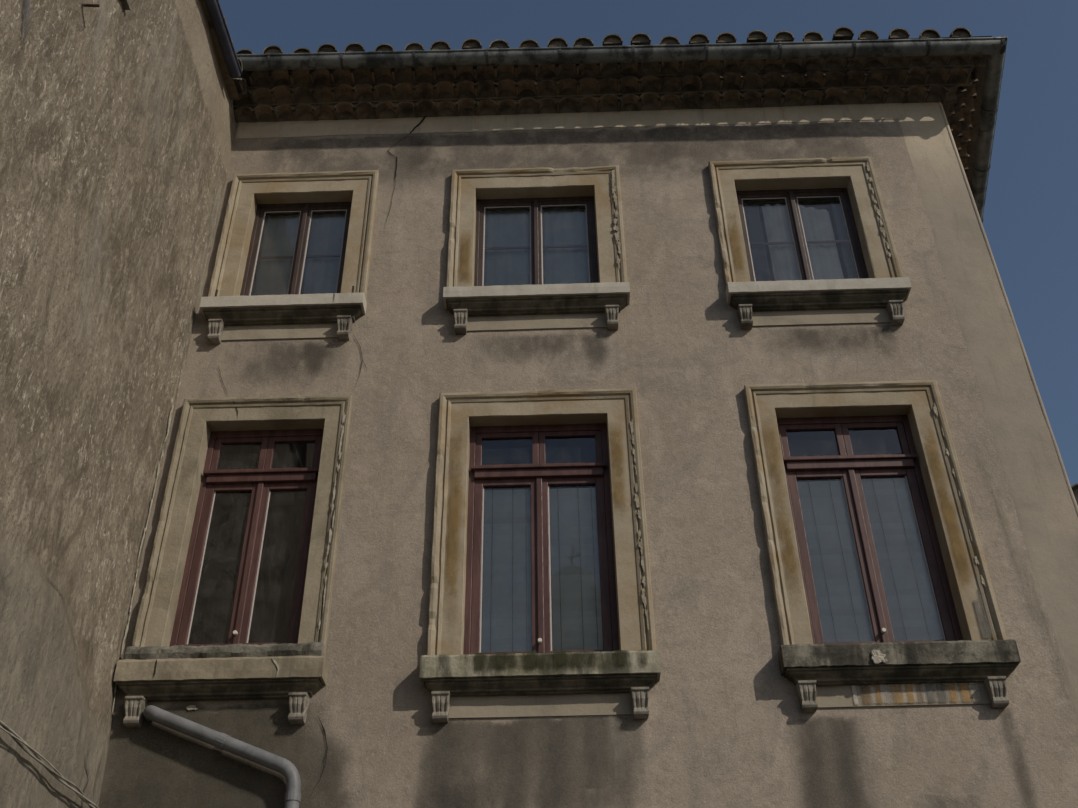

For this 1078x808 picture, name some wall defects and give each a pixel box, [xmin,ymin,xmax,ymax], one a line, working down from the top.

crack [384,117,425,234]
crack [310,719,328,797]